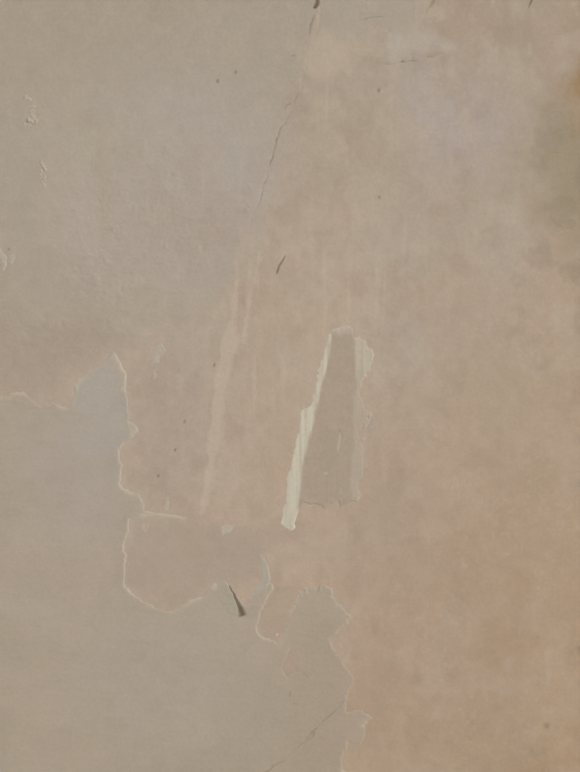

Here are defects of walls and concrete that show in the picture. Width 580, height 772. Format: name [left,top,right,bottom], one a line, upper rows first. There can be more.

crack [251,0,321,216]